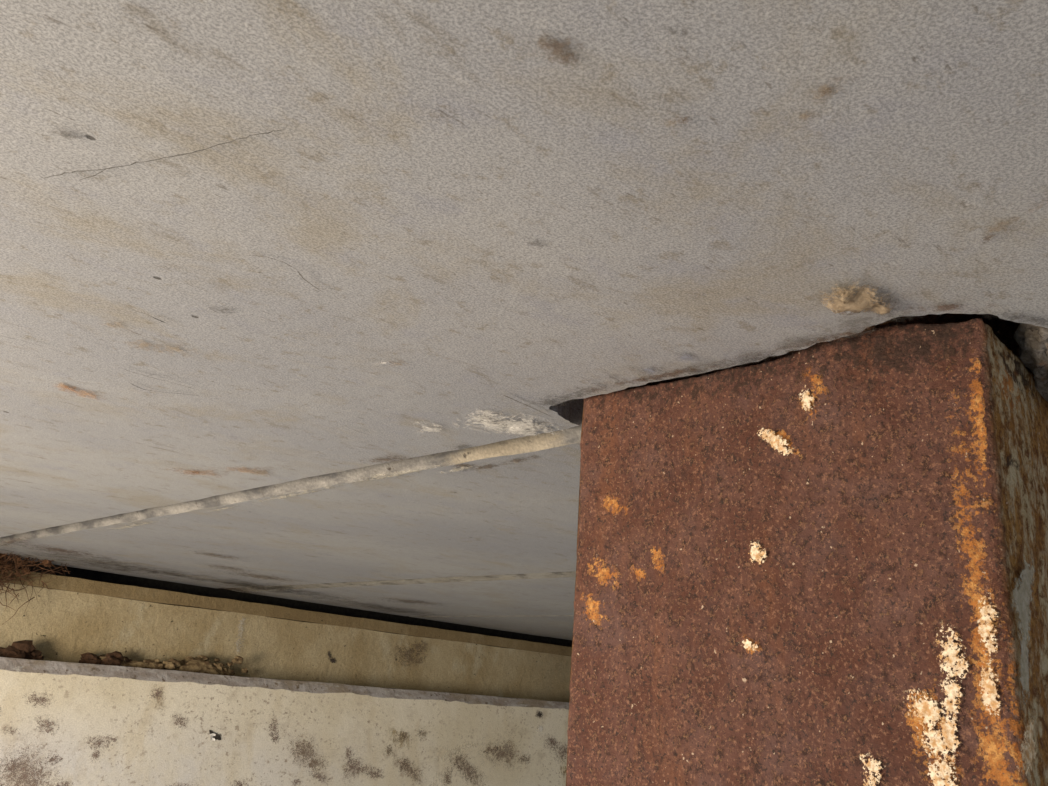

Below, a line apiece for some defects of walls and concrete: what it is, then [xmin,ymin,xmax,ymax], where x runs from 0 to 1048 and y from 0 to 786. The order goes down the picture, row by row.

damp [26,694,58,736]
damp [0,727,69,786]
damp [87,735,117,759]
damp [291,740,329,785]
damp [343,746,382,779]
damp [397,758,421,782]
damp [434,742,530,786]